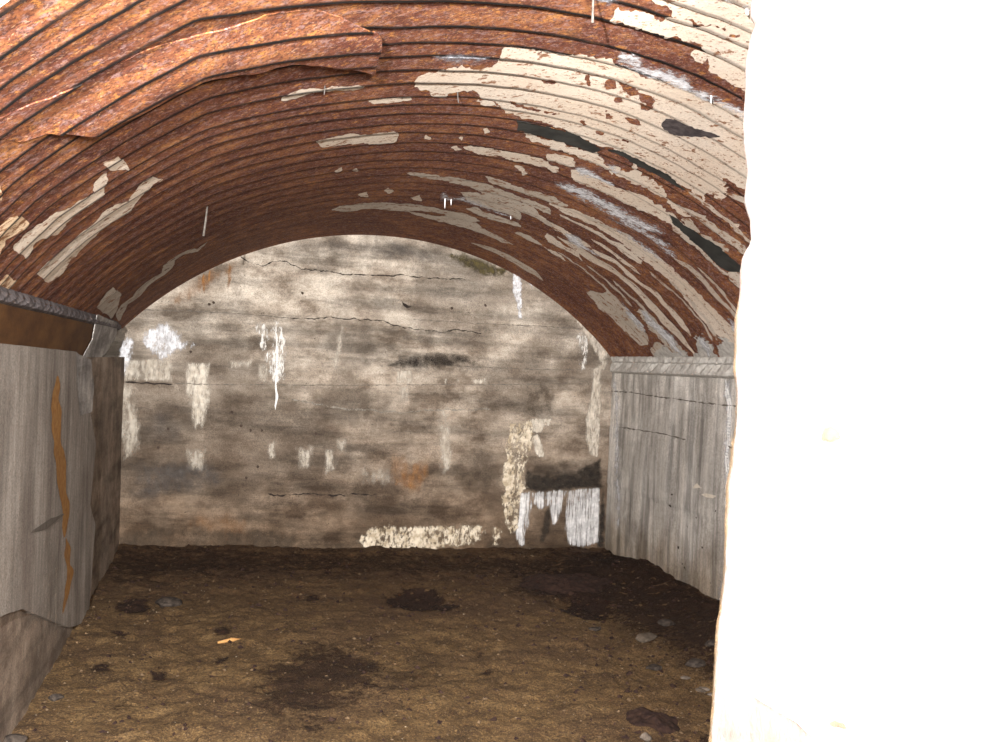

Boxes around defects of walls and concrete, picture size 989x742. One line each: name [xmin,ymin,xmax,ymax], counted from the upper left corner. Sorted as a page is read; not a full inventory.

peeling [610,0,755,91]
rust [510,101,685,190]
rust [604,79,655,126]
peeling [0,157,129,259]
peeling [37,177,163,283]
peeling [332,47,751,357]
rust [669,214,741,273]
rust [712,177,751,247]
water stain [119,325,187,372]
water stain [186,363,210,426]
water stain [232,322,286,410]
water stain [491,320,607,549]